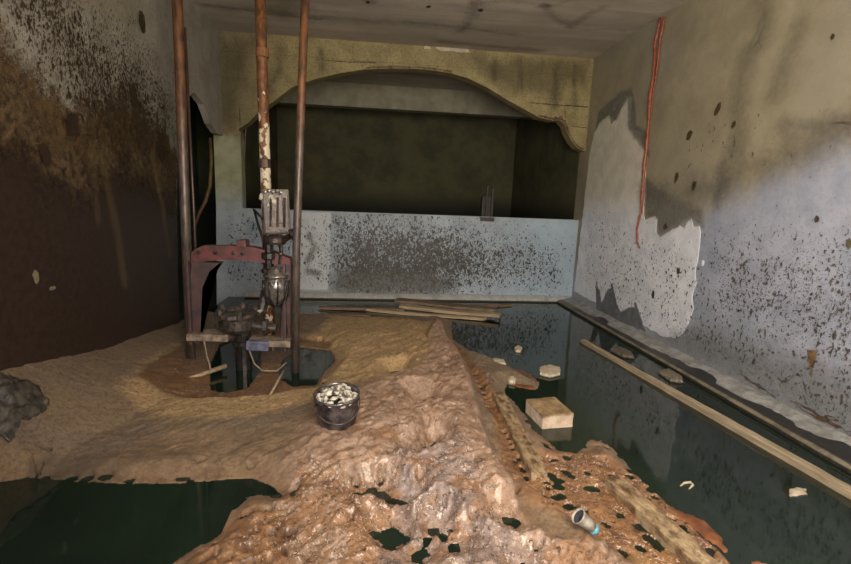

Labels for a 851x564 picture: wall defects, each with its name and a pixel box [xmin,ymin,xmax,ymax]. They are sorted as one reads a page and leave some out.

peeling [574,90,704,338]
corrosion [807,350,817,376]